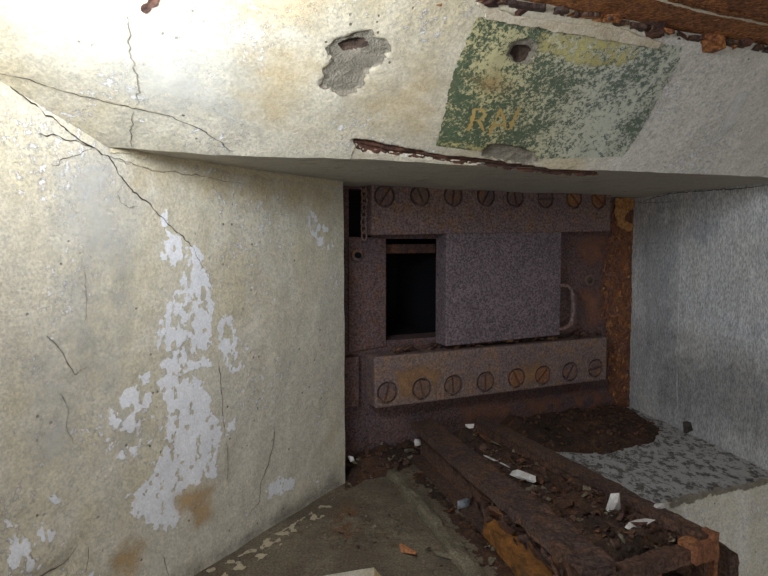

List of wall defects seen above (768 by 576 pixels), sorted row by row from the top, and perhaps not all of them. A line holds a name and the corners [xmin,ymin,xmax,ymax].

spalling [319,29,391,96]
spalling [506,38,538,64]
flaking render [477,2,662,49]
corrosion [475,0,768,53]
crack [0,17,241,285]
crack [638,185,764,203]
corrosion [506,197,635,407]
peeling [105,209,252,532]
corrosion [391,341,496,354]
peeling [265,476,295,500]
peeling [4,519,61,573]